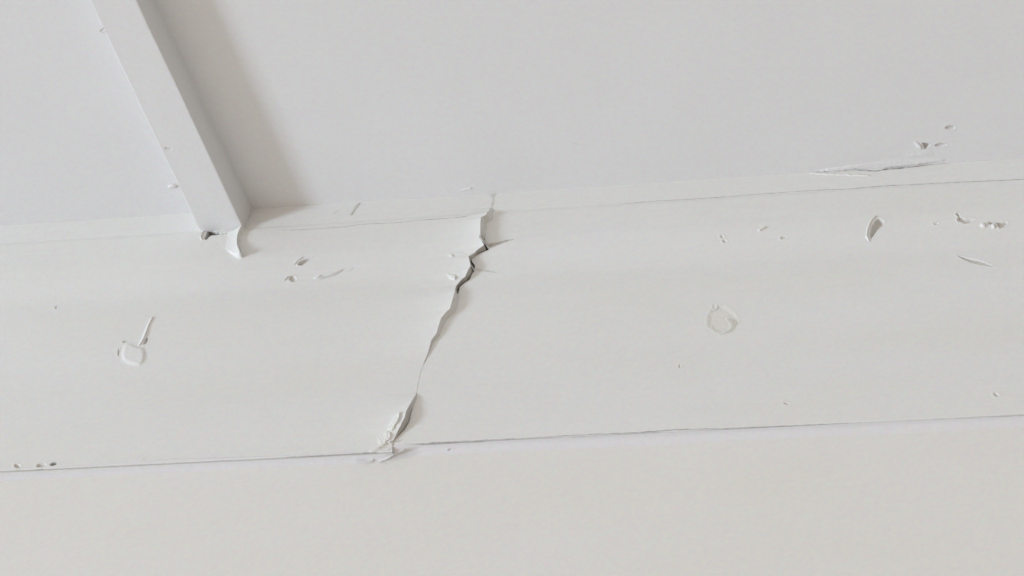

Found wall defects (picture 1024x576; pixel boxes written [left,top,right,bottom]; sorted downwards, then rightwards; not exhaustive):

peeling [200,230,227,241]
spalling [865,216,887,242]
crack [278,193,514,360]